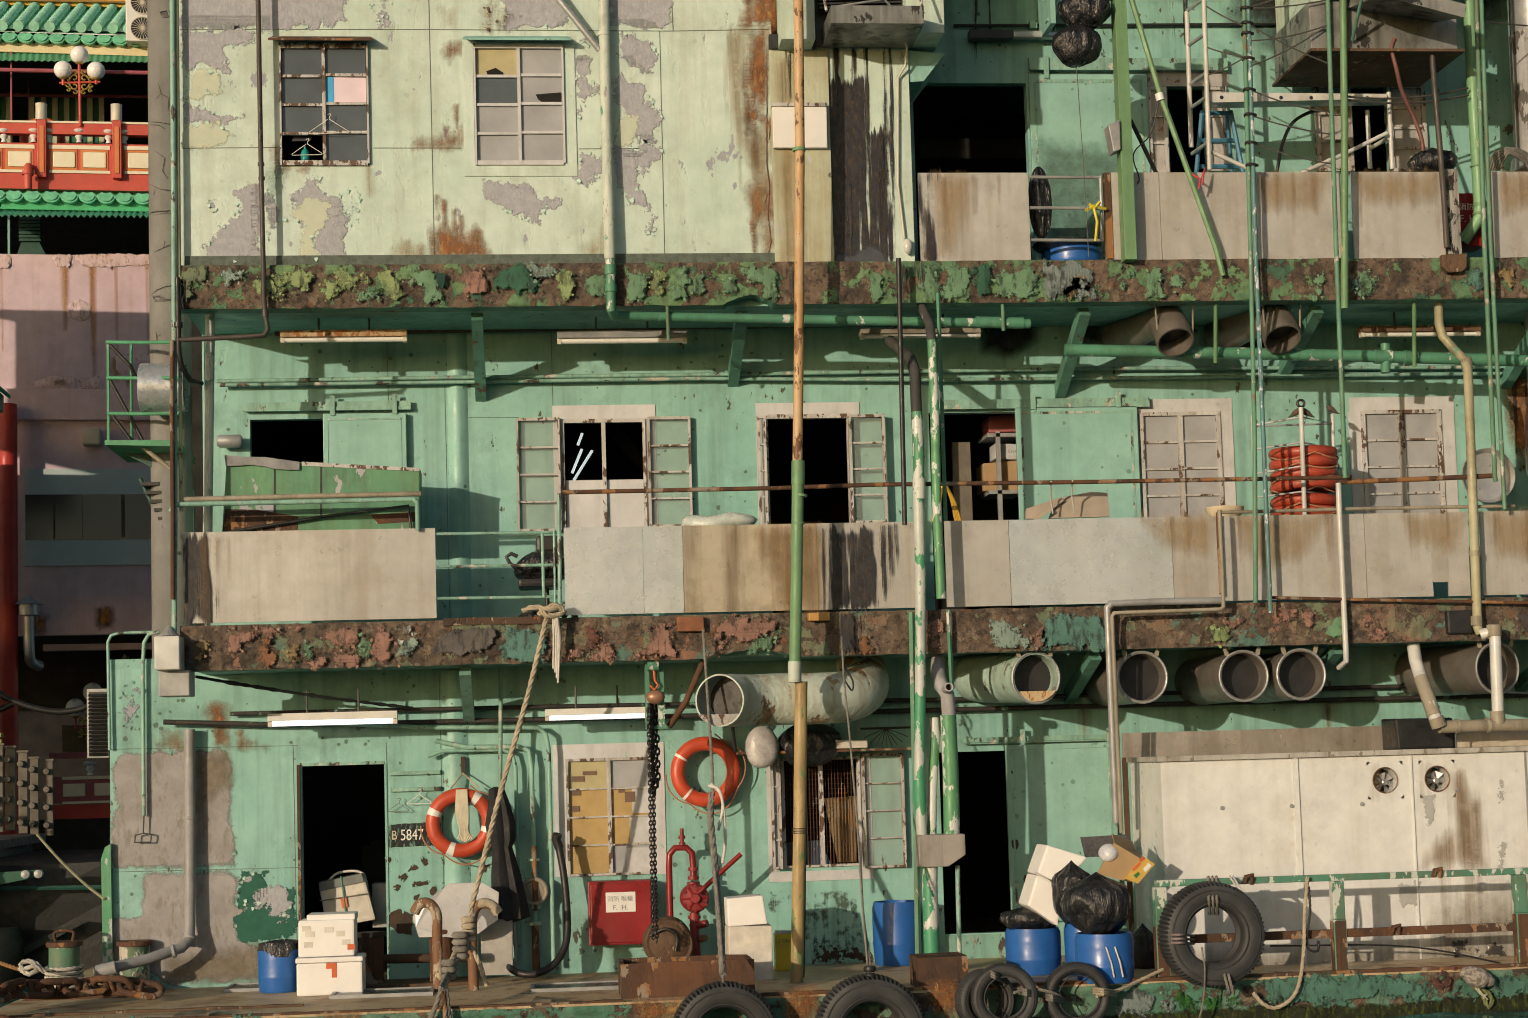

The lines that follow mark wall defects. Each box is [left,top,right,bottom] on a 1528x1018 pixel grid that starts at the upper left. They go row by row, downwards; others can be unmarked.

peeling [159,0,348,130]
peeling [572,0,673,236]
corrosion [740,0,777,157]
damp [833,48,894,238]
peeling [152,173,444,307]
corrosion [432,200,487,255]
peeling [461,260,606,301]
peeling [626,260,780,303]
corrosion [750,184,788,253]
peeling [918,258,1097,304]
damp [881,523,898,599]
peeling [111,748,299,985]